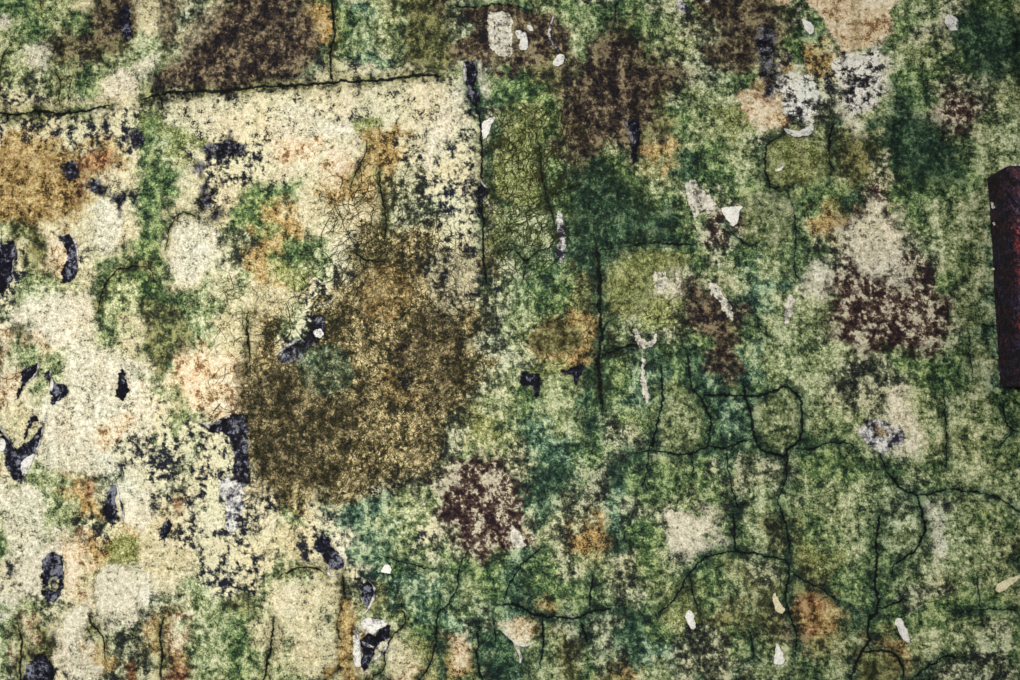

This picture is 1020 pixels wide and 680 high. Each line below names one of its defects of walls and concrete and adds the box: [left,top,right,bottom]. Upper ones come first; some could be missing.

crack [0,72,110,122]
mould [43,0,138,61]
mould [149,0,321,101]
crack [142,0,442,109]
peeling [802,0,899,110]
spalling [0,361,69,483]
water stain [218,246,484,533]
peeling [13,540,64,604]
spalling [353,579,390,671]
water stain [436,449,529,558]
crack [632,350,855,653]
crack [848,389,1020,680]